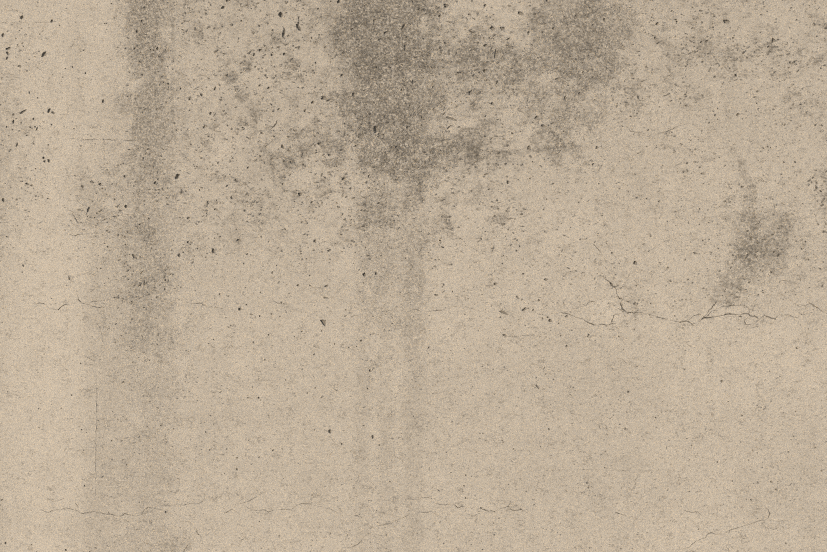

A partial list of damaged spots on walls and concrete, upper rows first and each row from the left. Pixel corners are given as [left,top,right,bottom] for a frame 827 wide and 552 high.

leakage [339,0,431,183]
crack [561,278,827,327]